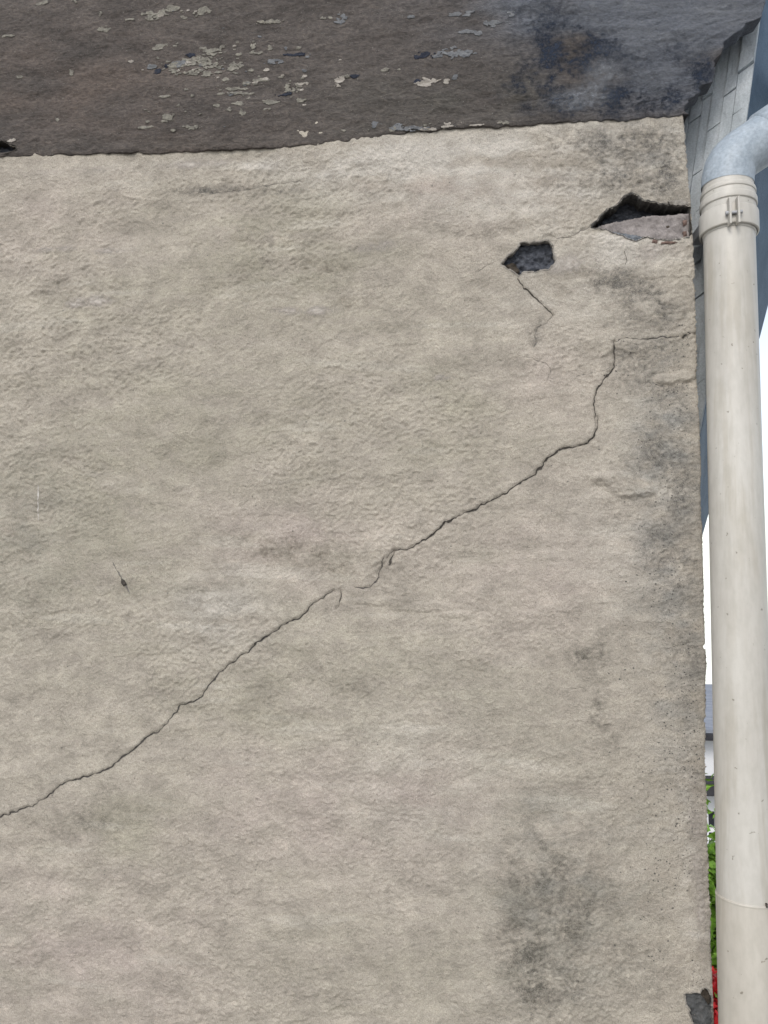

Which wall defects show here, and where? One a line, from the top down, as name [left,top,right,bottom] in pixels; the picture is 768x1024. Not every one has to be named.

peeling [125,0,219,21]
peeling [128,19,311,116]
peeling [413,74,458,87]
water stain [512,0,712,117]
peeling [341,121,484,134]
spalling [500,239,582,276]
spalling [591,192,691,245]
crack [517,279,553,380]
crack [0,336,679,818]
water stain [620,519,703,930]
water stain [502,915,549,1002]
peeling [683,987,714,1024]